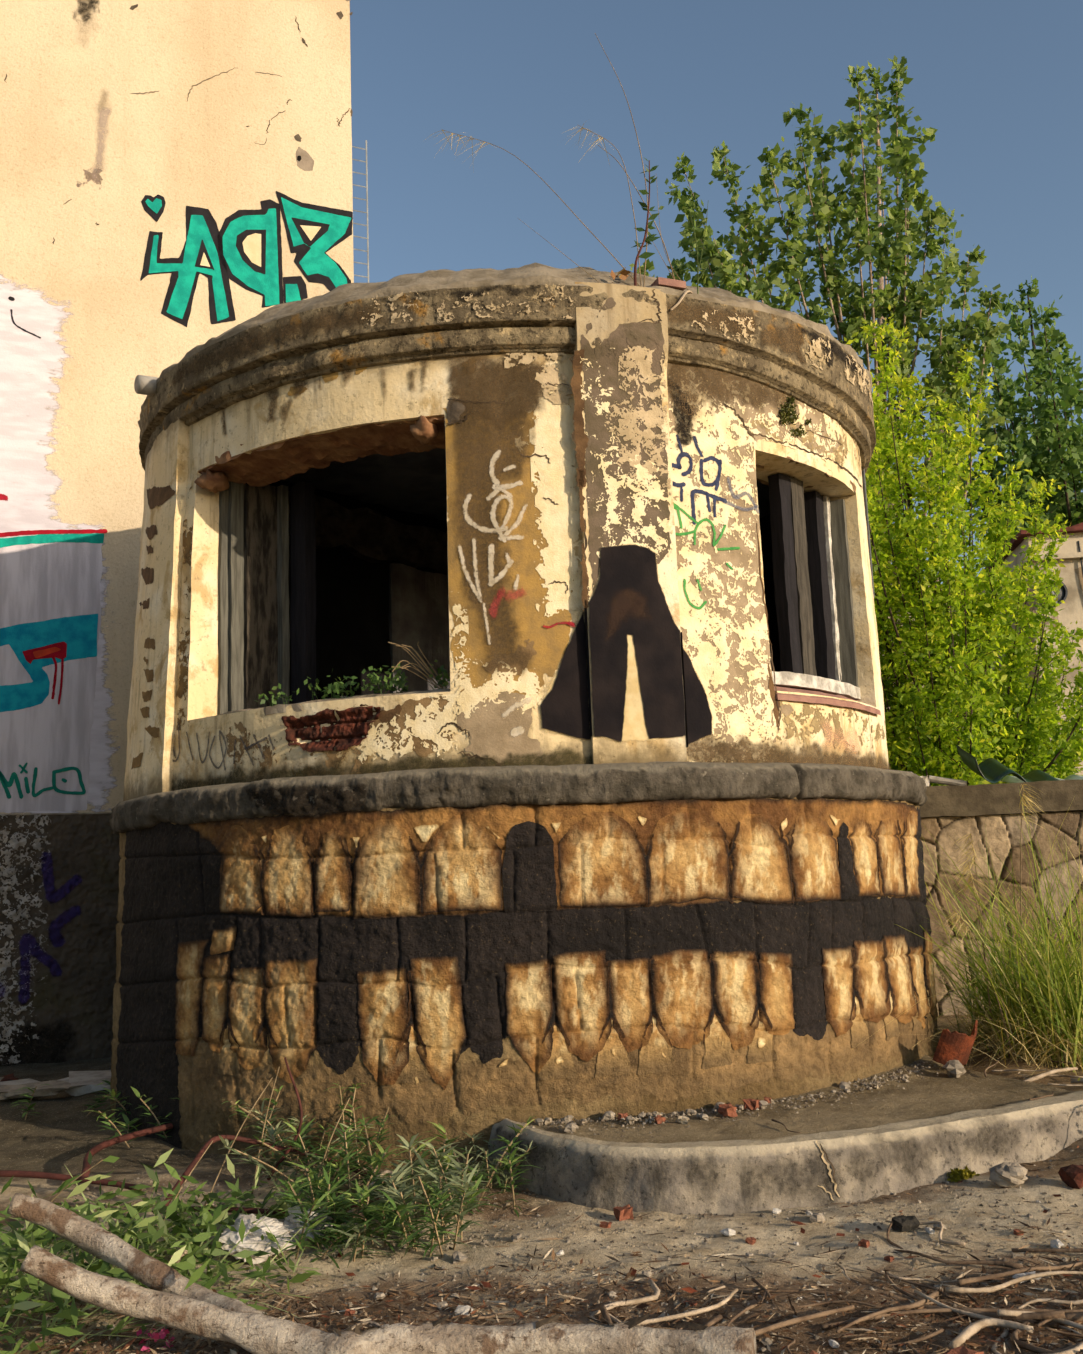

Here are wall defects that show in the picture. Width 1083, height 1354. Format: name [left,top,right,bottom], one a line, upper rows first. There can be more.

leakage [74,0,98,21]
peeling [226,284,885,778]